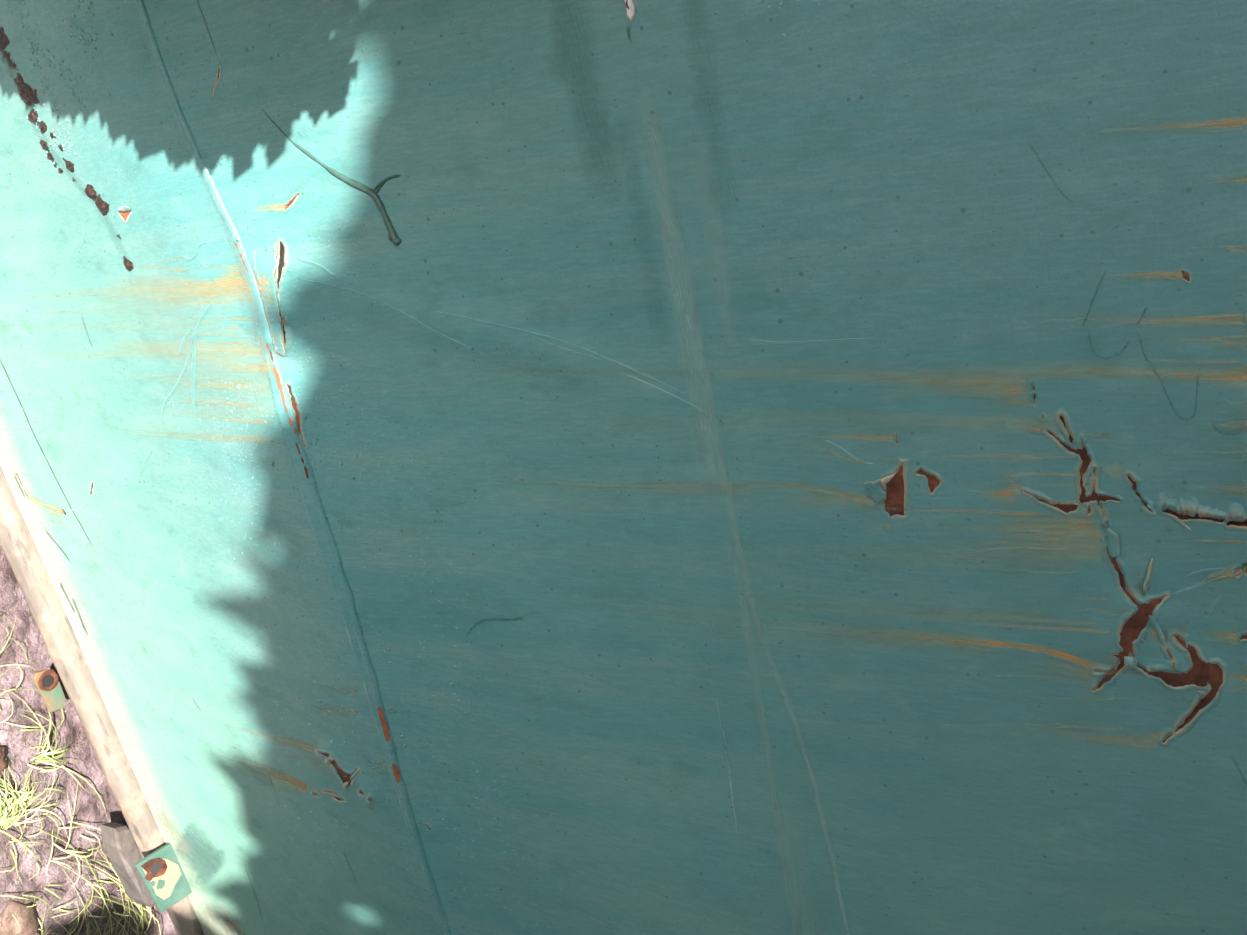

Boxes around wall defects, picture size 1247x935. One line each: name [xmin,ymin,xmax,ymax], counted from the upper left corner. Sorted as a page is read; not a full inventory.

corrosion [0,26,109,216]
corrosion [123,256,134,272]
corrosion [172,242,270,302]
corrosion [260,335,310,478]
peeling [825,428,945,529]
corrosion [377,707,390,742]
peeling [264,739,375,805]